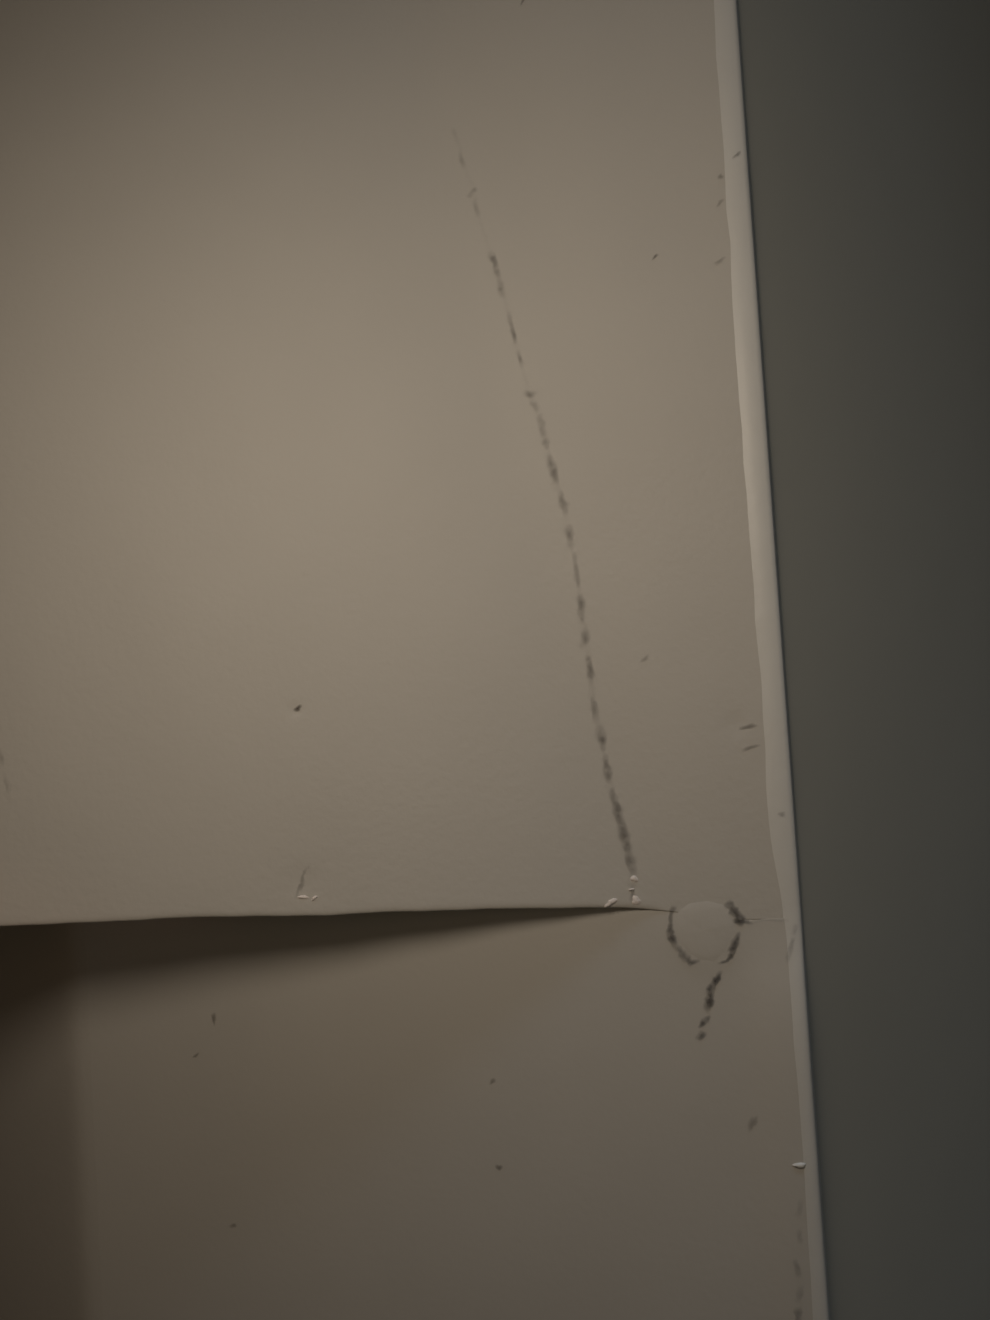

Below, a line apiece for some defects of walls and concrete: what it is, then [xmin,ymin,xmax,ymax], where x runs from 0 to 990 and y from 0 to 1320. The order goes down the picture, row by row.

peeling [604,875,641,908]
crack [701,908,743,1036]